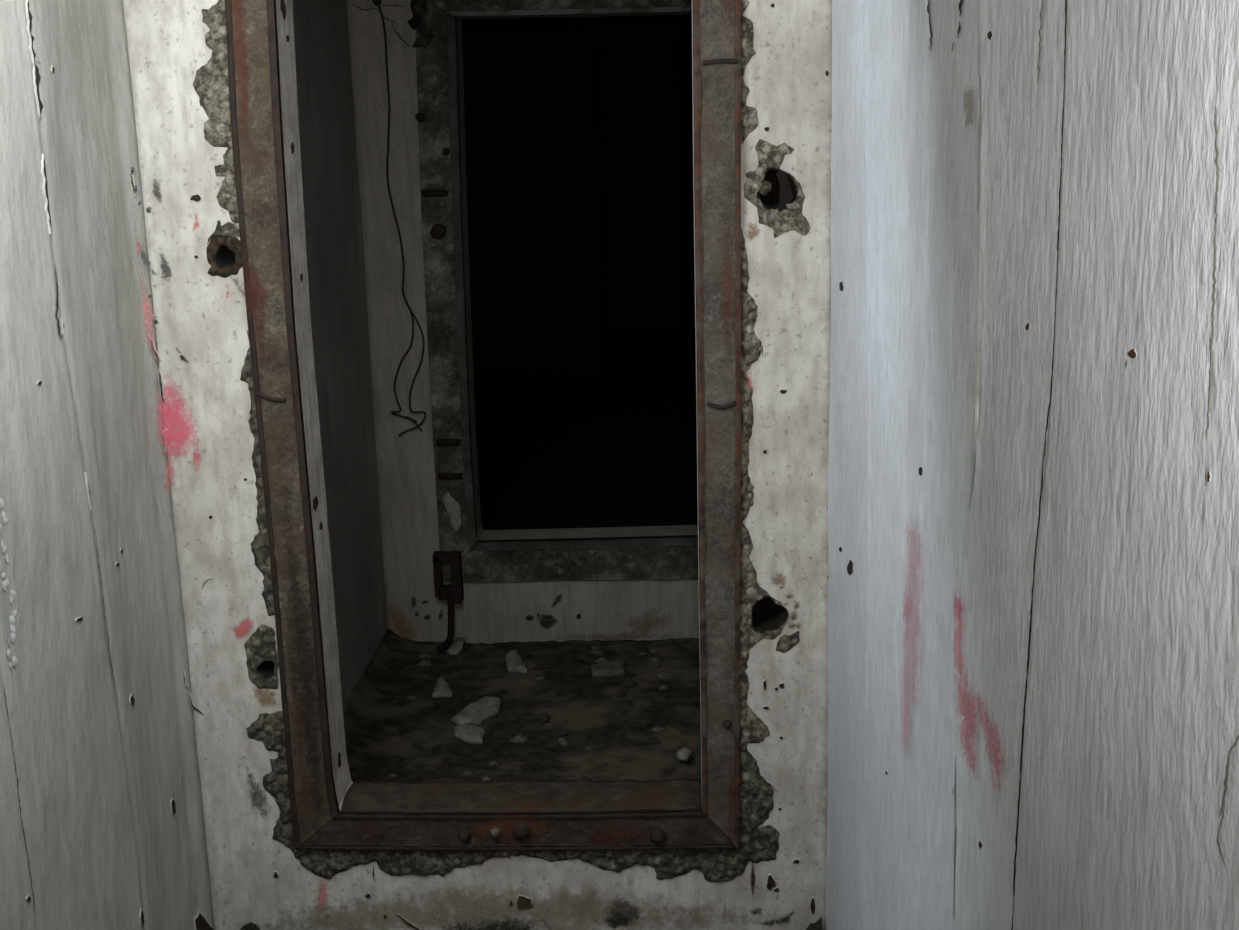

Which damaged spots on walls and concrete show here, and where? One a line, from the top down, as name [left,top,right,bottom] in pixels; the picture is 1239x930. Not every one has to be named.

crack [25,0,44,119]
crack [41,153,52,234]
crack [55,266,65,341]
spalling [190,0,243,278]
corrosion [227,268,266,347]
spalling [407,0,434,48]
spalling [740,0,810,238]
crack [84,471,120,714]
spalling [240,331,279,689]
spalling [246,228,800,892]